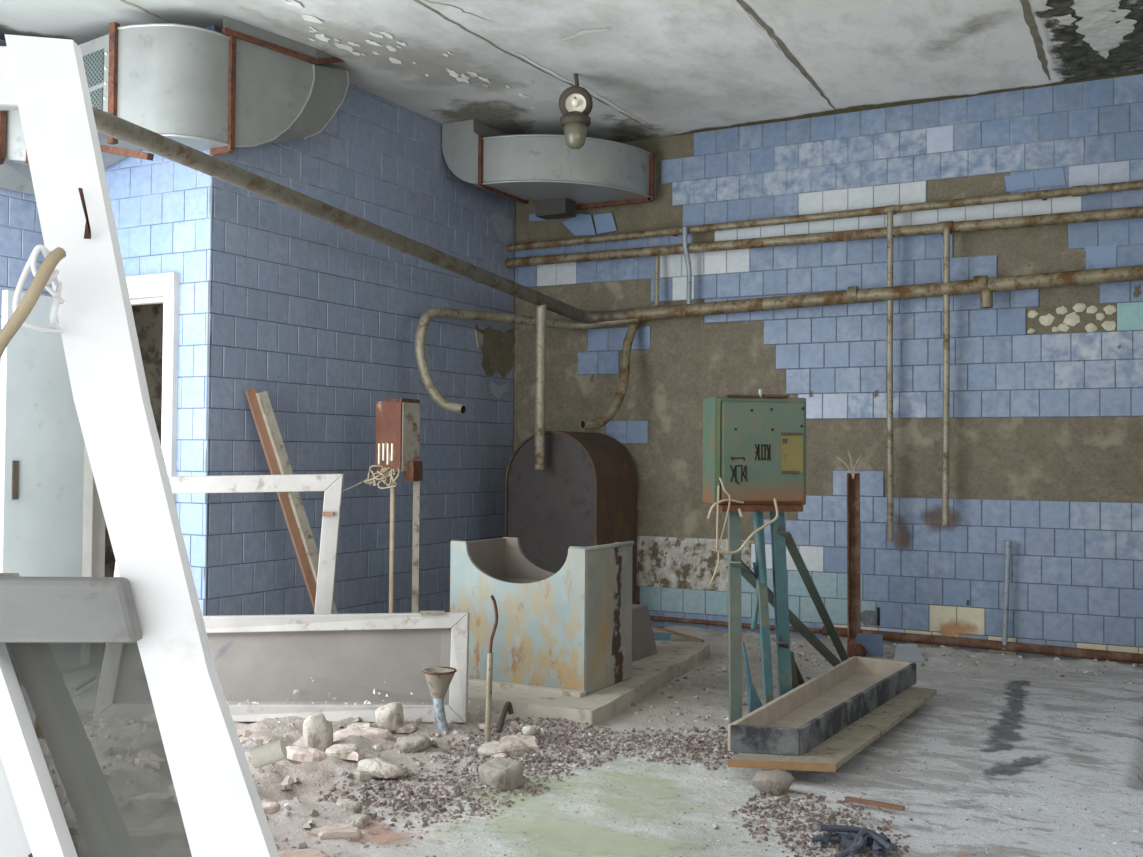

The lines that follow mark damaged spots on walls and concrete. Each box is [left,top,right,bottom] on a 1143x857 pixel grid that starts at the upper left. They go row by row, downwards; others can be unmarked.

peeling [281,0,429,76]
peeling [443,52,490,87]
leakage [443,102,529,135]
leakage [611,121,655,143]
peeling [514,133,714,244]
peeling [927,172,1010,202]
peeling [953,224,1116,277]
peeling [1030,284,1112,308]
peeling [475,279,798,543]
peeling [806,416,1143,503]